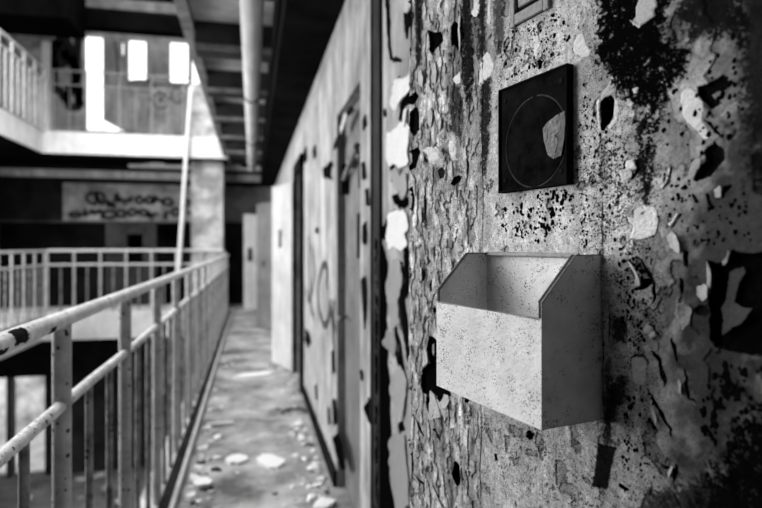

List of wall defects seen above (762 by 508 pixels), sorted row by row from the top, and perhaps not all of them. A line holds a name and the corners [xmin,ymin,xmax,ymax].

peeling [385,0,401,63]
peeling [403,0,413,58]
spalling [596,76,639,132]
damp [501,0,762,350]
spalling [681,75,728,182]
peeling [361,69,441,508]
peeling [666,232,689,266]
spalling [676,249,762,357]